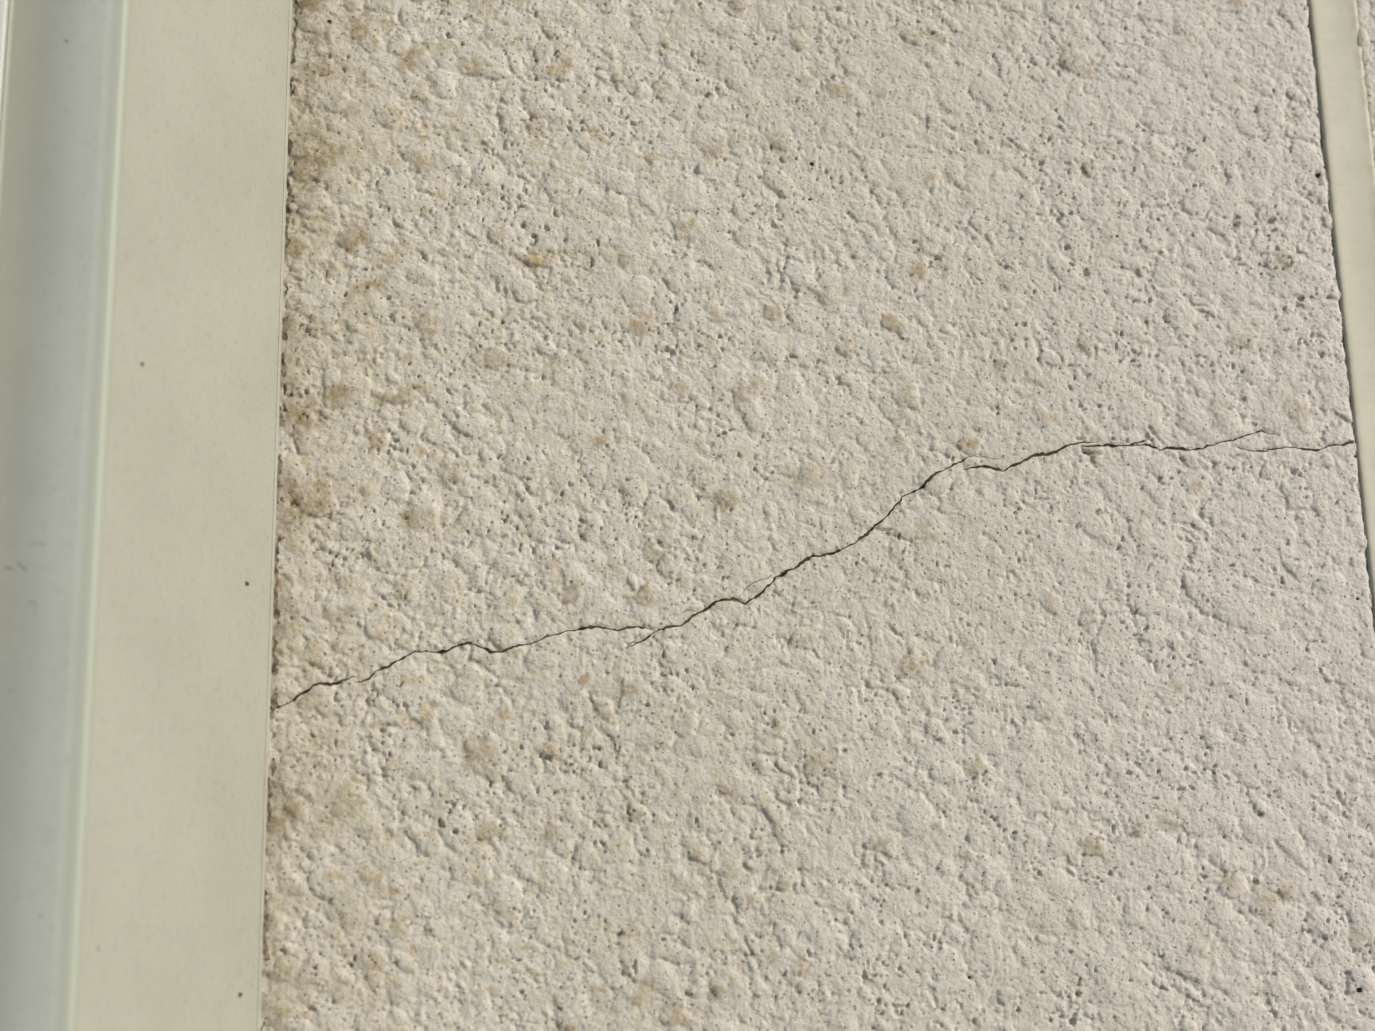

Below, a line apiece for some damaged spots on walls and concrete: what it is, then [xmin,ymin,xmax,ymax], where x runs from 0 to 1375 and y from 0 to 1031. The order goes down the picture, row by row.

crack [270,430,1354,710]